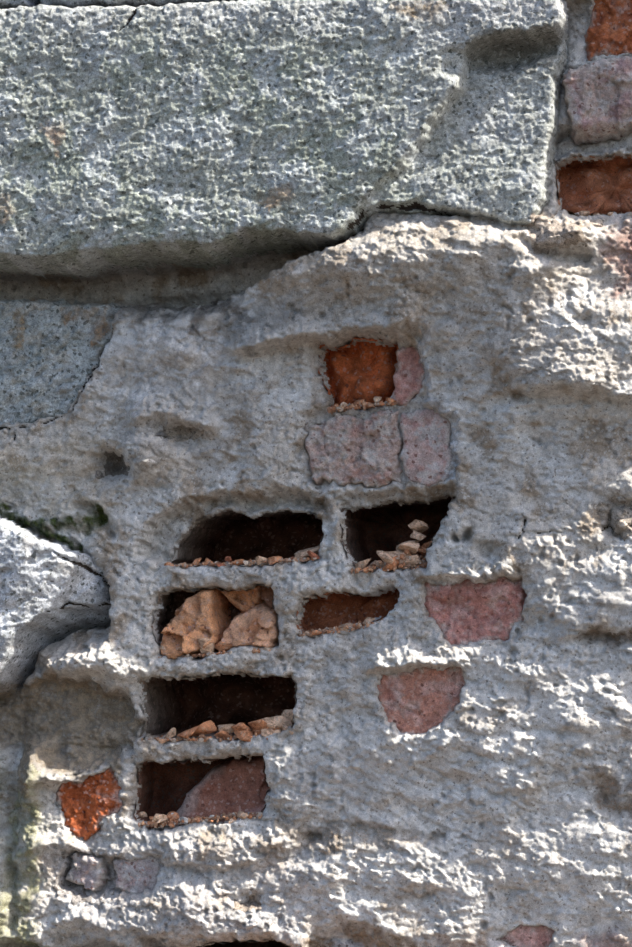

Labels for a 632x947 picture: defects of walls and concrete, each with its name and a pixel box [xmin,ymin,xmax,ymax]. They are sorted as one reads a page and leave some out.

spalling [318,337,399,410]
spalling [95,451,130,479]
spalling [155,425,204,443]
hole [167,510,324,568]
spalling [340,495,455,571]
spalling [151,585,280,661]
hole [296,588,400,638]
spalling [138,672,297,743]
damp [10,742,31,843]
spalling [133,754,271,830]
hole [198,939,290,947]